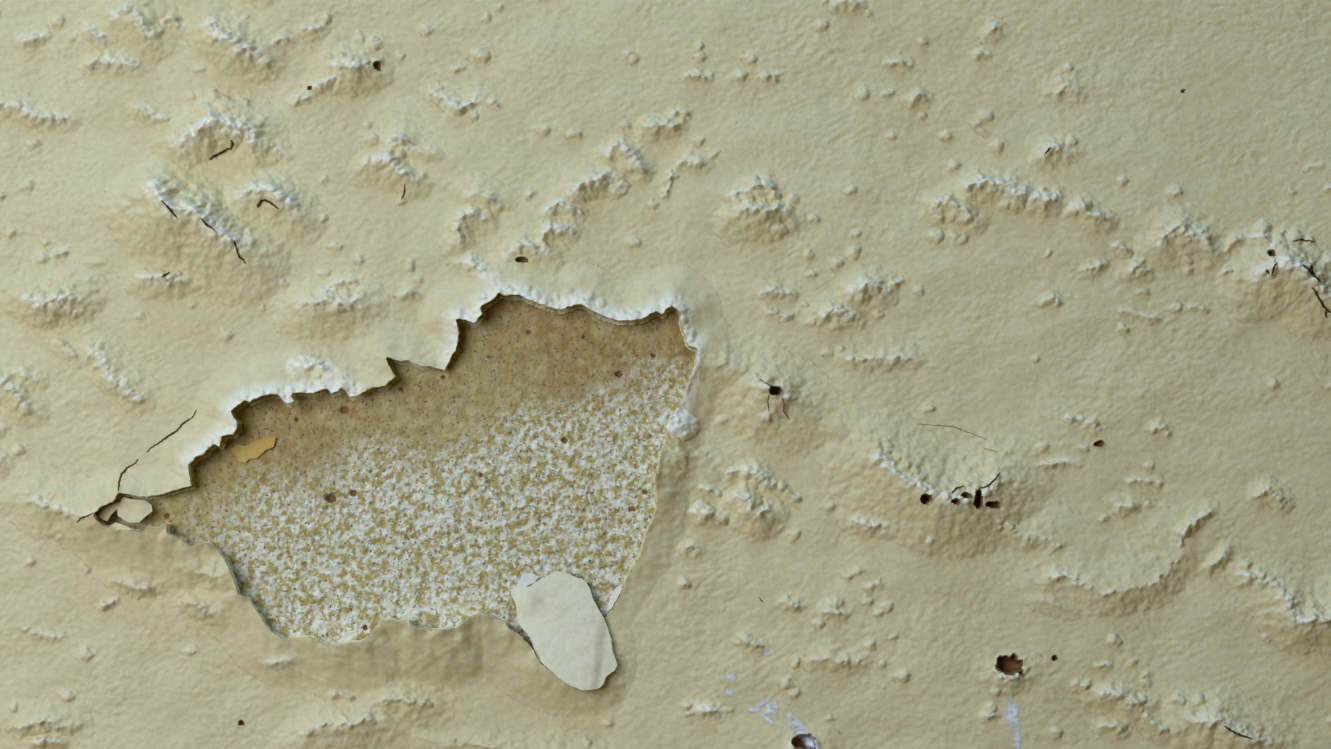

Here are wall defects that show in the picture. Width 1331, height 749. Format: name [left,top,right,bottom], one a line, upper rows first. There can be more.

peeling [70,255,736,717]